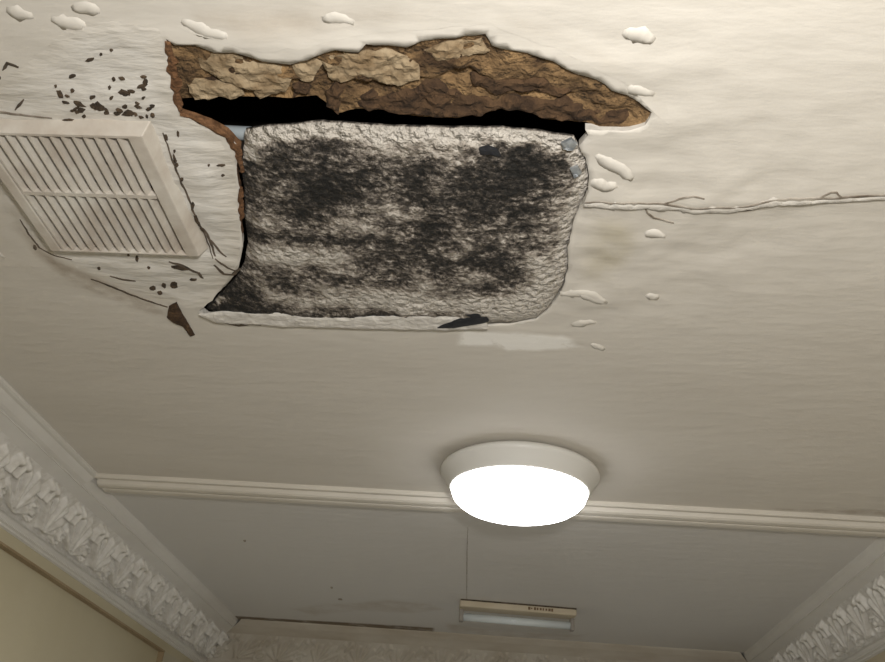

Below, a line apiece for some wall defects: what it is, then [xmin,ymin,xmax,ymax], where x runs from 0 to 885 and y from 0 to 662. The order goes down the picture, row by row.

peeling [6,5,34,22]
peeling [51,1,100,30]
peeling [322,11,355,26]
flaking render [171,18,656,127]
peeling [0,74,155,121]
peeling [590,154,634,192]
crack [583,191,885,224]
peeling [645,229,666,239]
peeling [149,282,178,295]
peeling [560,290,608,305]
flaking render [167,302,195,337]